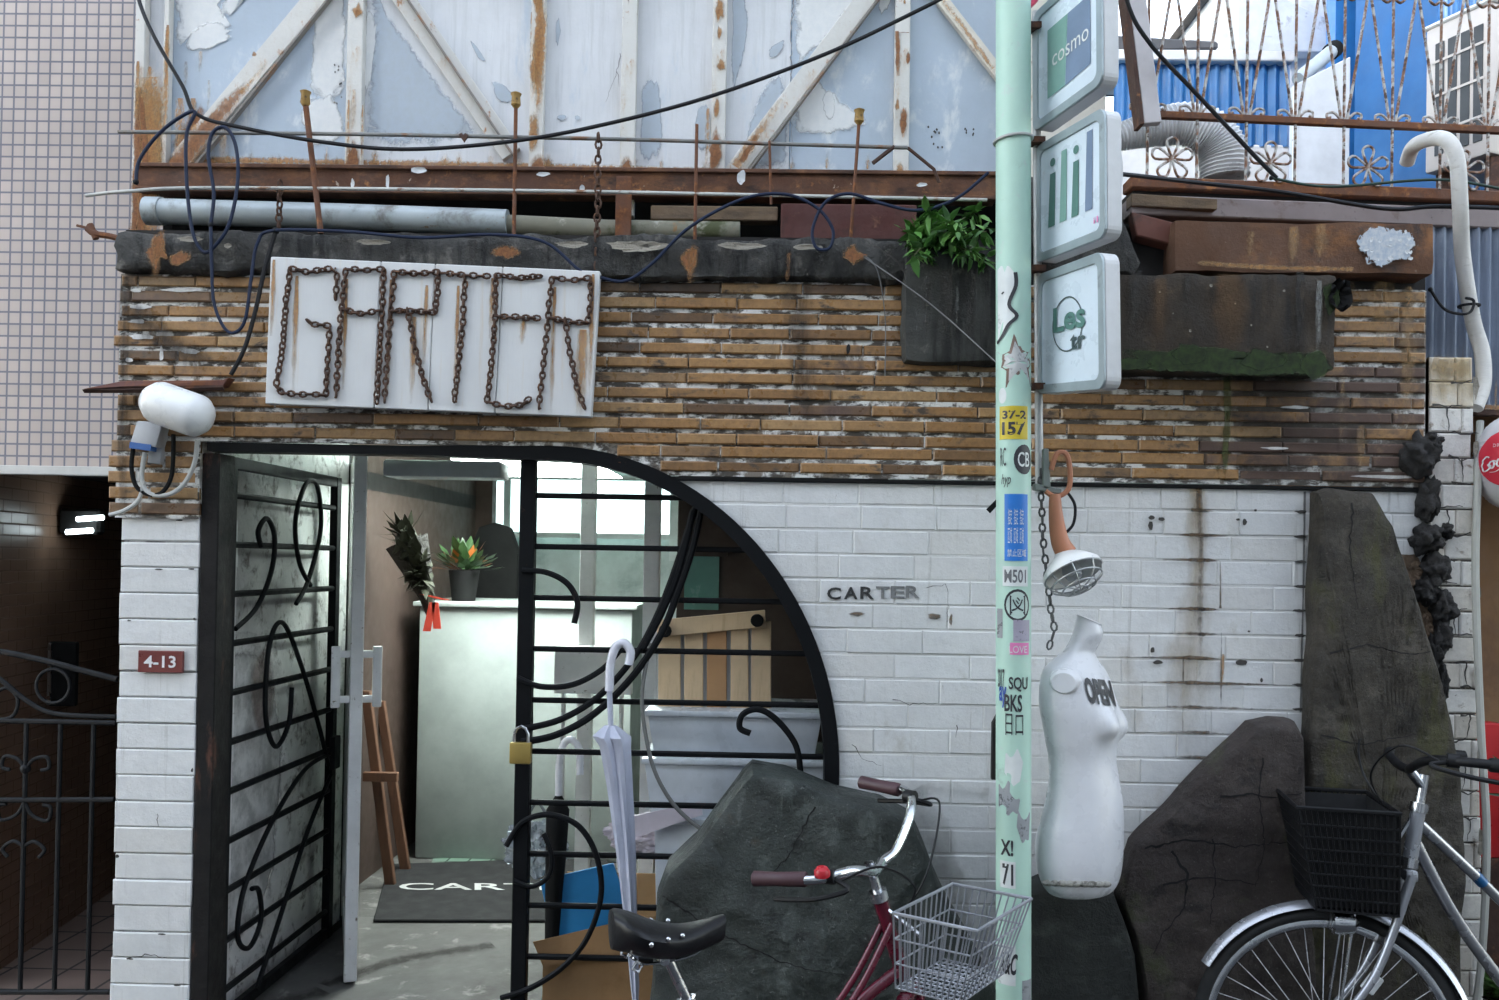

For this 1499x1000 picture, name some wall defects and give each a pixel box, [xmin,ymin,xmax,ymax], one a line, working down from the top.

peeling [175,0,244,50]
corrosion [129,0,776,275]
corrosion [844,245,867,263]
corrosion [1203,227,1353,271]